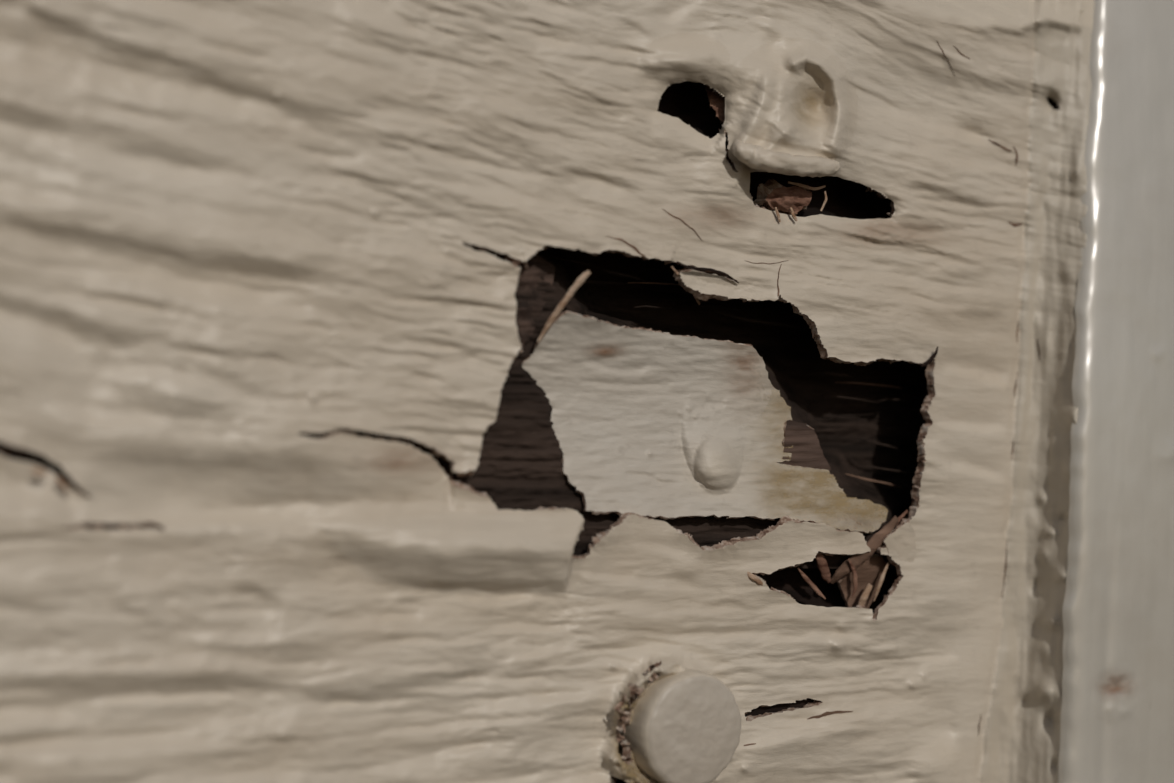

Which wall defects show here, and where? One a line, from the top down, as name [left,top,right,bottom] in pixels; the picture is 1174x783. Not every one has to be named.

spalling [657,81,732,165]
spalling [749,172,892,219]
crack [0,441,164,531]
crack [299,429,459,481]
peeling [448,242,938,614]
crack [744,698,853,746]